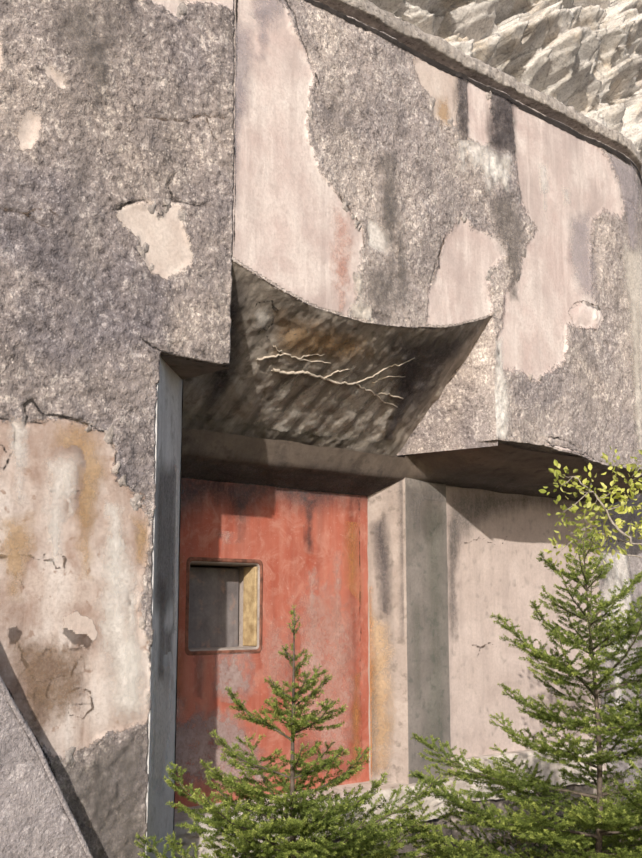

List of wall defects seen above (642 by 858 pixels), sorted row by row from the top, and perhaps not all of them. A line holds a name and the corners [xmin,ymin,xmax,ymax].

flaking render [140,0,388,315]
flaking render [413,56,494,147]
leakage [457,78,516,190]
flaking render [116,198,194,282]
flaking render [425,104,626,383]
leakage [50,459,76,553]
flaking render [0,417,152,766]
leakage [153,457,395,783]
crack [7,688,57,781]
crack [70,656,94,719]